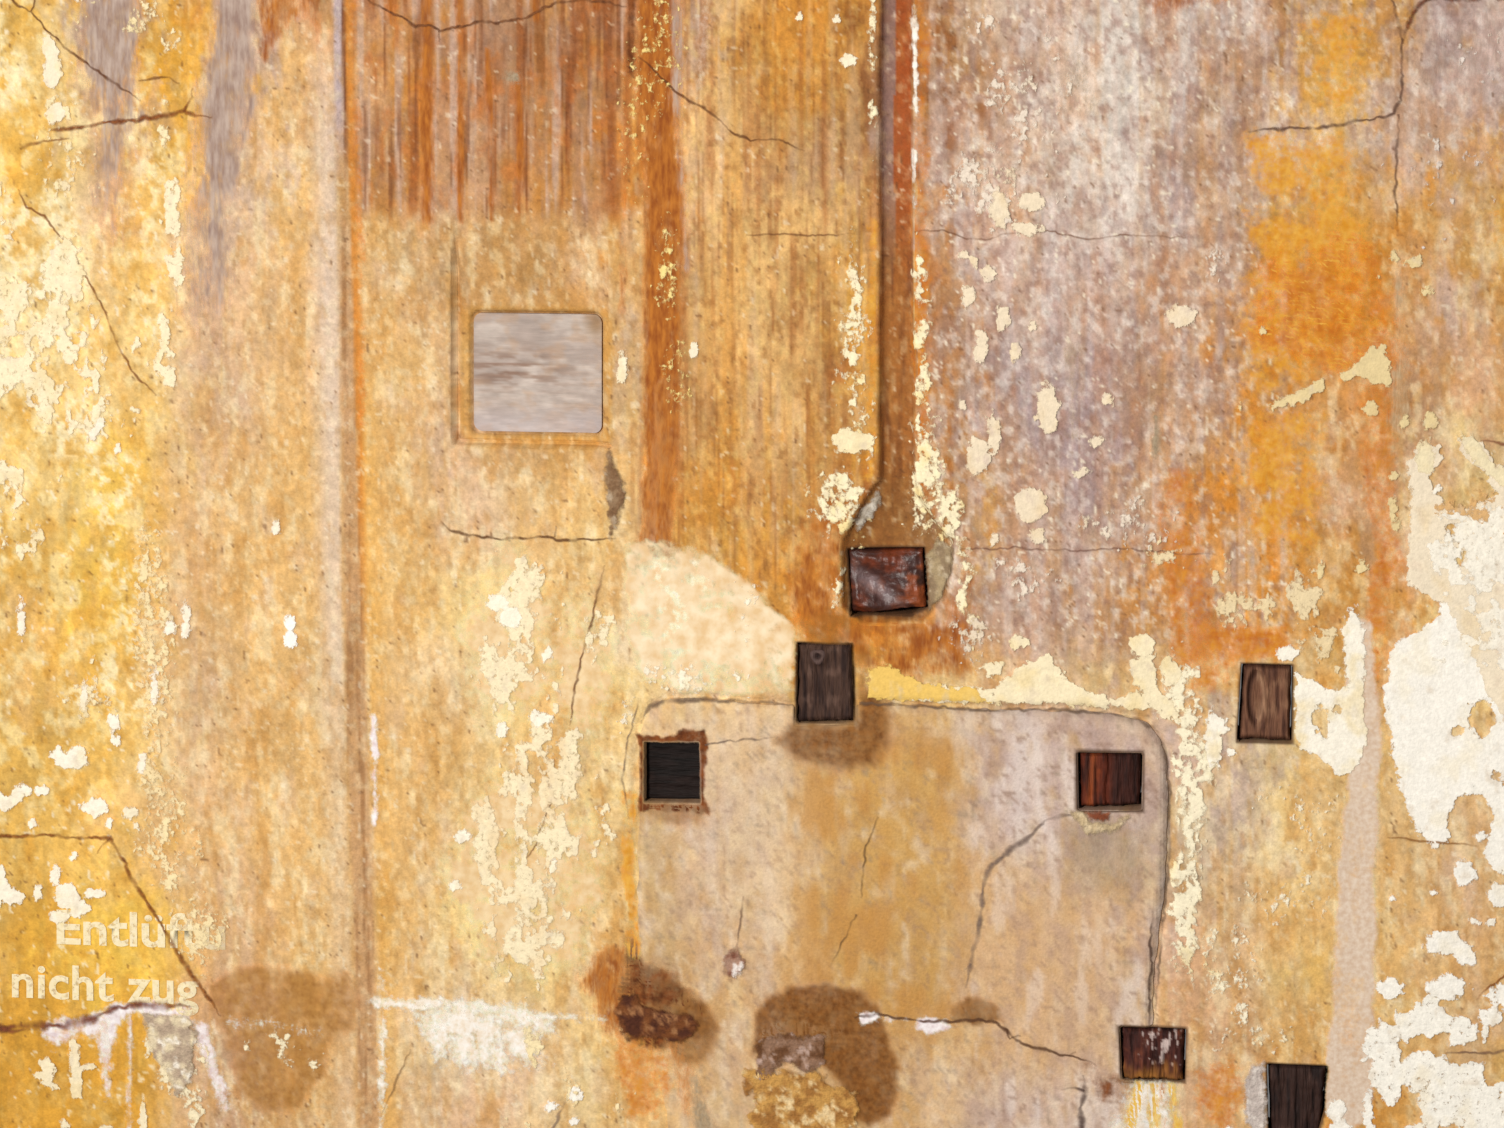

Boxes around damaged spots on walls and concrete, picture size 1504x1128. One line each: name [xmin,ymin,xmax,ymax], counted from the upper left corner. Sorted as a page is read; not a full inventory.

crack [12,0,196,144]
peeling [0,235,140,454]
corrosion [624,0,684,558]
corrosion [1240,130,1400,391]
corrosion [1160,471,1290,687]
water stain [370,714,380,826]
peeling [453,554,616,998]
peeling [865,250,1287,1128]
crack [0,834,214,1033]
water stain [42,967,576,1111]
water stain [752,983,1000,1127]
crack [863,1014,1085,1128]